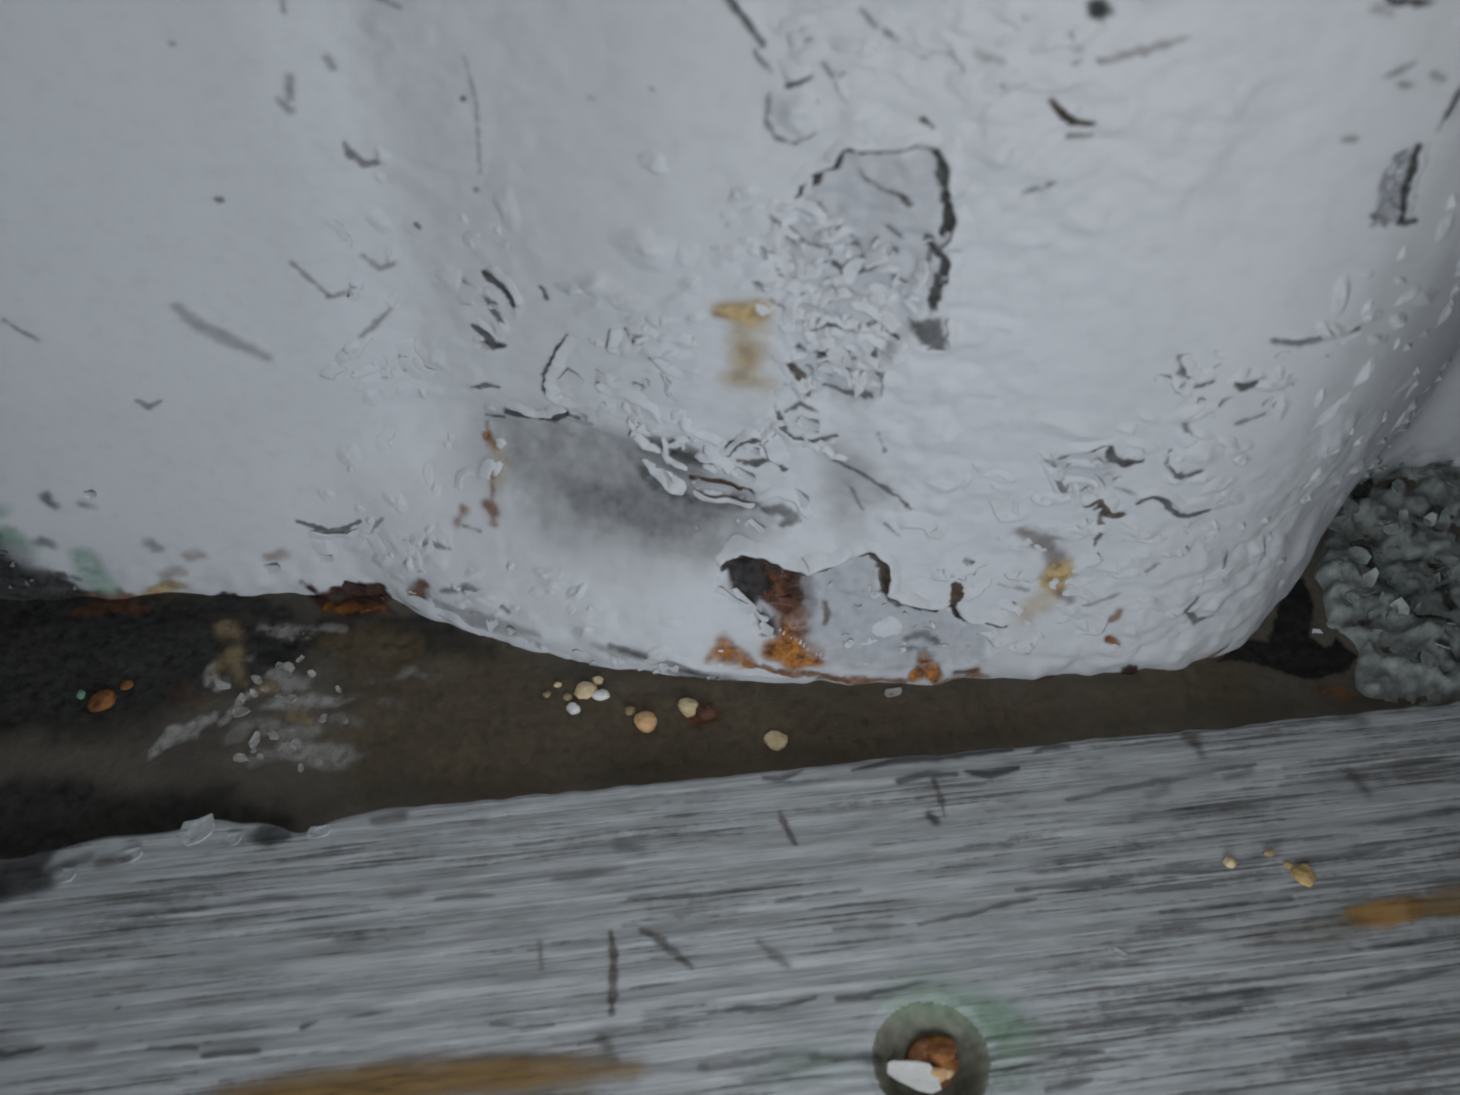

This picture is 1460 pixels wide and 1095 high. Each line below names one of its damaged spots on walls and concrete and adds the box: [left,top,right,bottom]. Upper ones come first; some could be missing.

peeling [1371,141,1431,226]
peeling [471,264,523,350]
corrosion [717,304,764,327]
peeling [476,334,650,424]
peeling [640,117,1010,654]
leakage [0,541,495,732]
corrosion [709,610,986,685]
corrosion [1121,665,1138,675]
leakage [0,783,289,856]